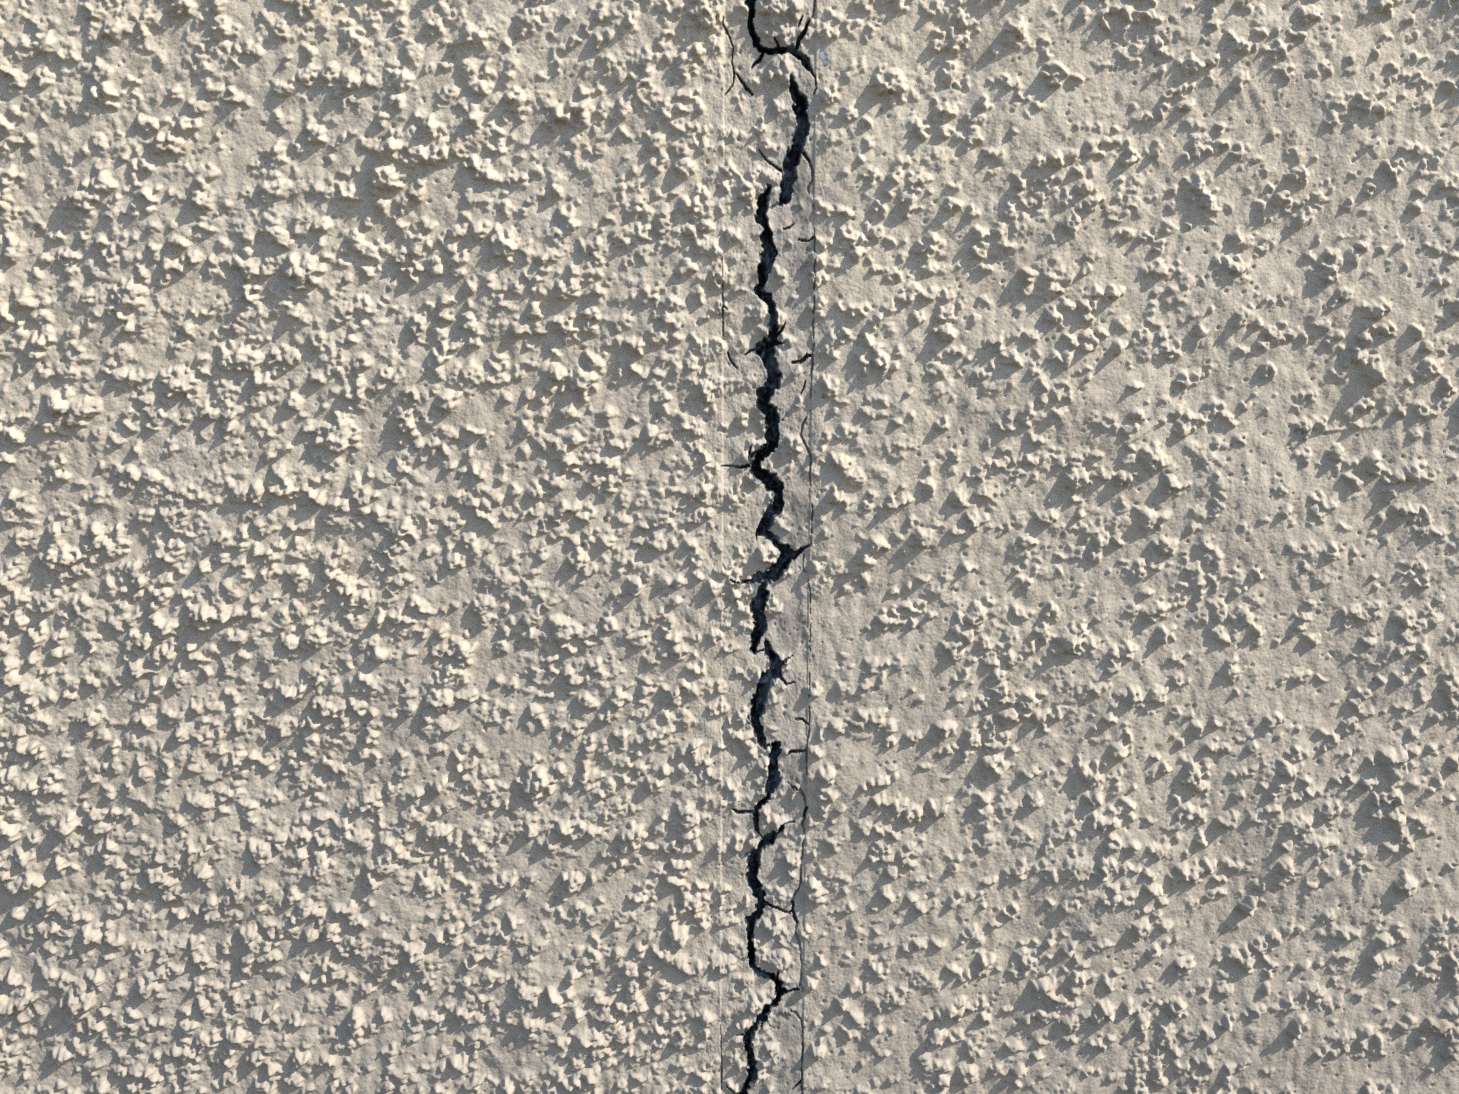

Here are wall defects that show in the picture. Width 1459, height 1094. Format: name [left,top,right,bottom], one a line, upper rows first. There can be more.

crack [720,0,817,1094]